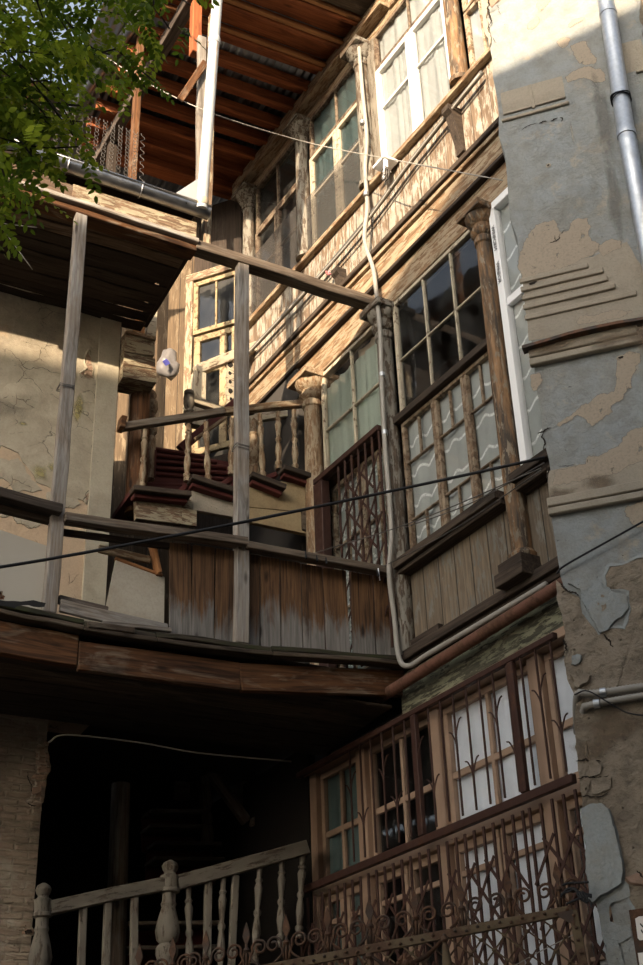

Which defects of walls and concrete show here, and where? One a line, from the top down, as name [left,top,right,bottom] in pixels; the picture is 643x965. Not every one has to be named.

flaking render [480,0,506,48]
peeling [557,17,606,83]
flaking render [634,0,643,45]
peeling [518,218,599,285]
peeling [577,310,633,324]
peeling [553,427,643,486]
peeling [624,501,643,528]
flaking render [556,555,643,910]